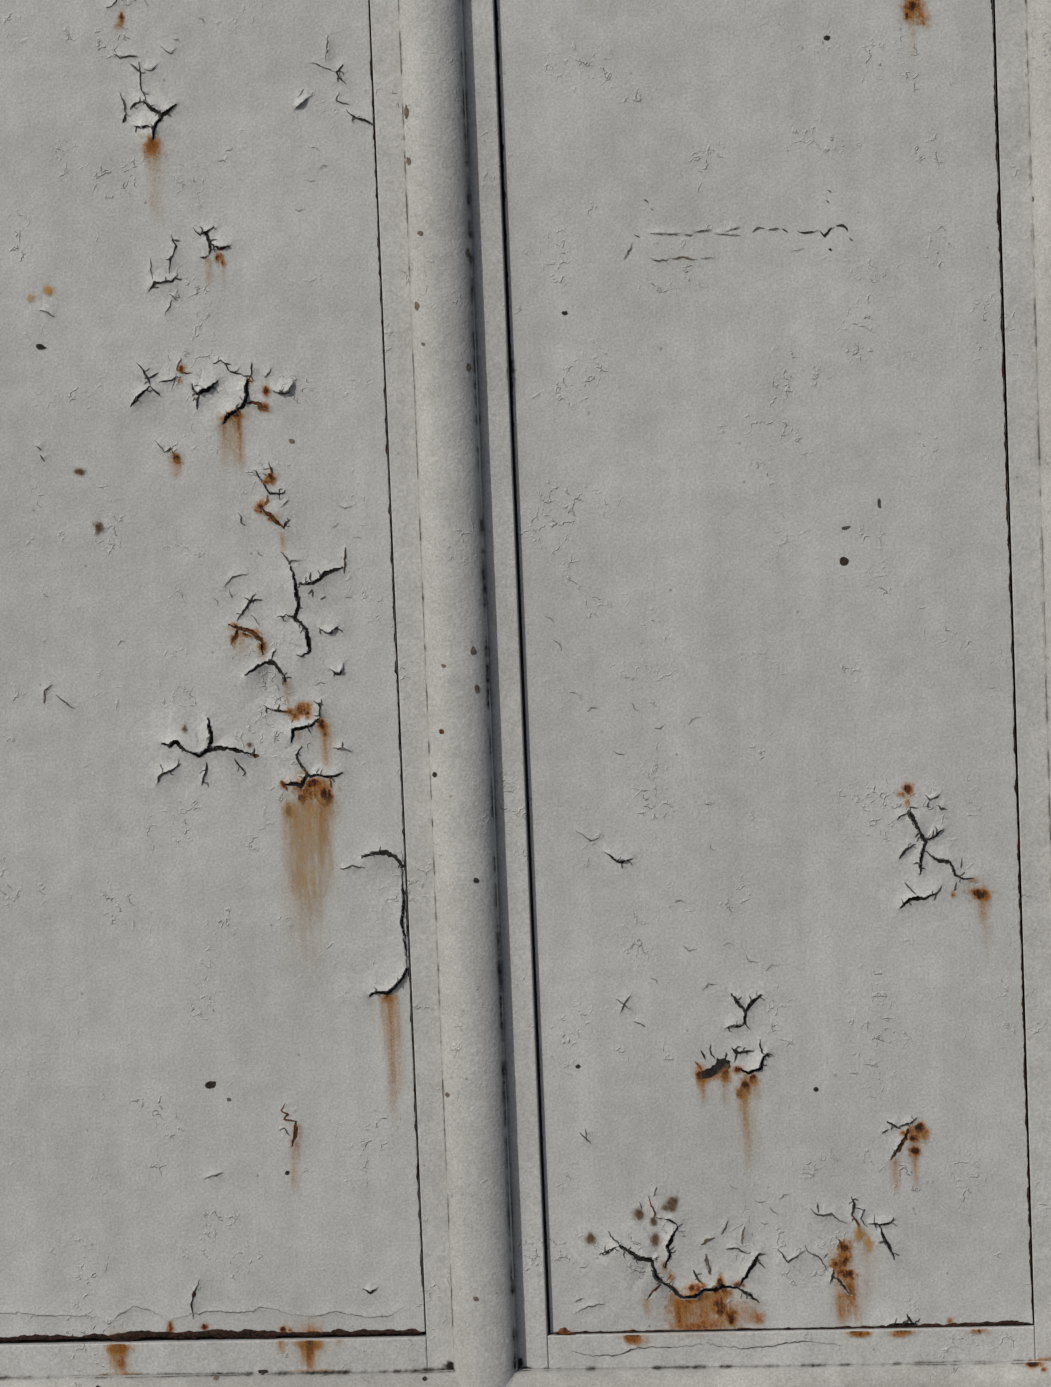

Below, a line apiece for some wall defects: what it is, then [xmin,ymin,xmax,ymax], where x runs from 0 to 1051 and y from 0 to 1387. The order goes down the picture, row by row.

crack [94,0,204,63]
corrosion [144,137,159,155]
corrosion [222,379,270,448]
crack [209,501,280,685]
corrosion [370,50,423,1292]
corrosion [553,0,1033,1344]
corrosion [279,778,333,851]
peeling [323,833,409,1010]
crack [266,1092,313,1159]
crack [871,1106,931,1175]
corrosion [0,1321,422,1375]